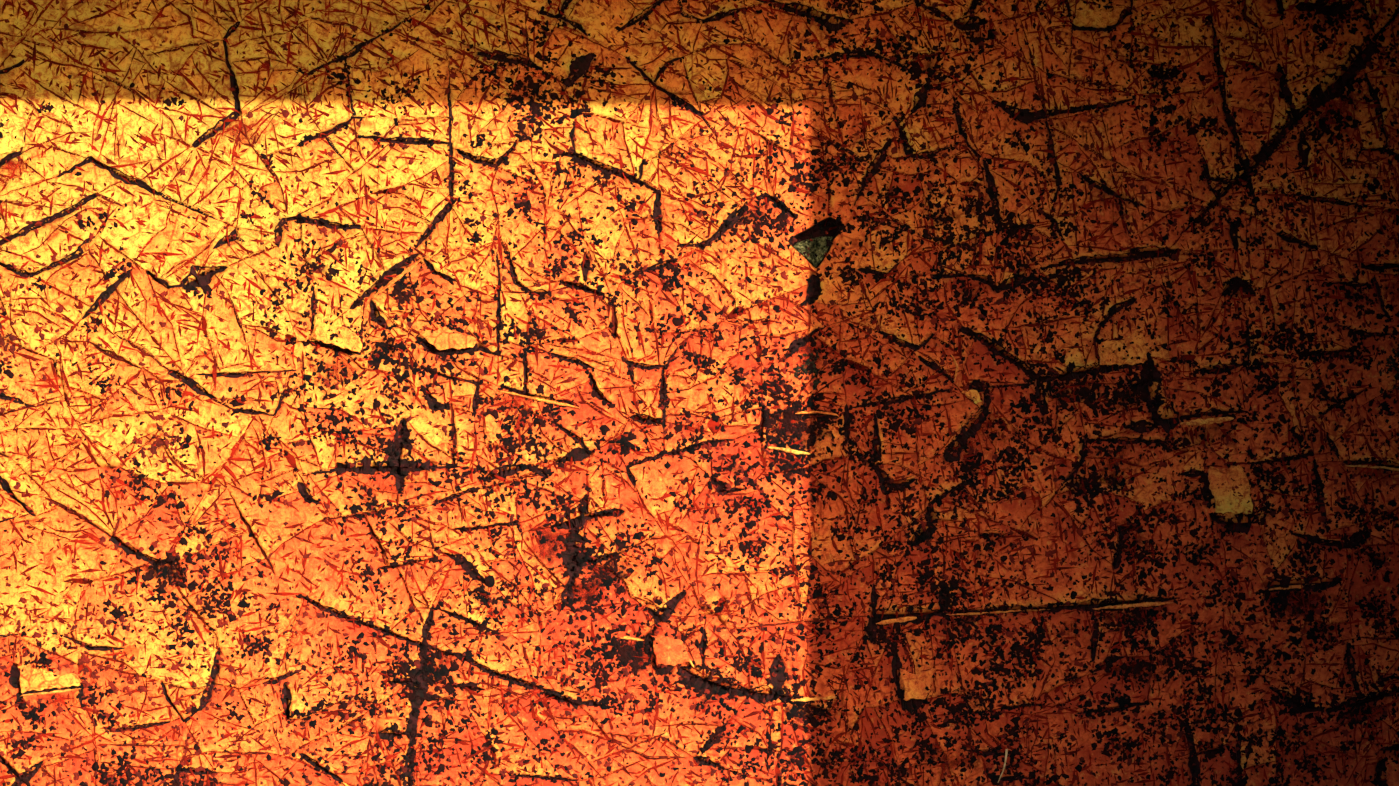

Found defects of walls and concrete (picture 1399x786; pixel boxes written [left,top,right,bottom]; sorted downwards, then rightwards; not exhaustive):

peeling [1180,417,1238,448]
peeling [1208,465,1253,514]
crack [823,495,836,529]
rust [532,525,562,557]
crack [40,564,56,577]
crack [0,605,24,620]
rust [558,584,598,604]
crack [592,585,621,629]
crack [582,619,613,662]
crack [32,655,57,673]
crack [606,710,616,729]
crack [894,745,930,786]